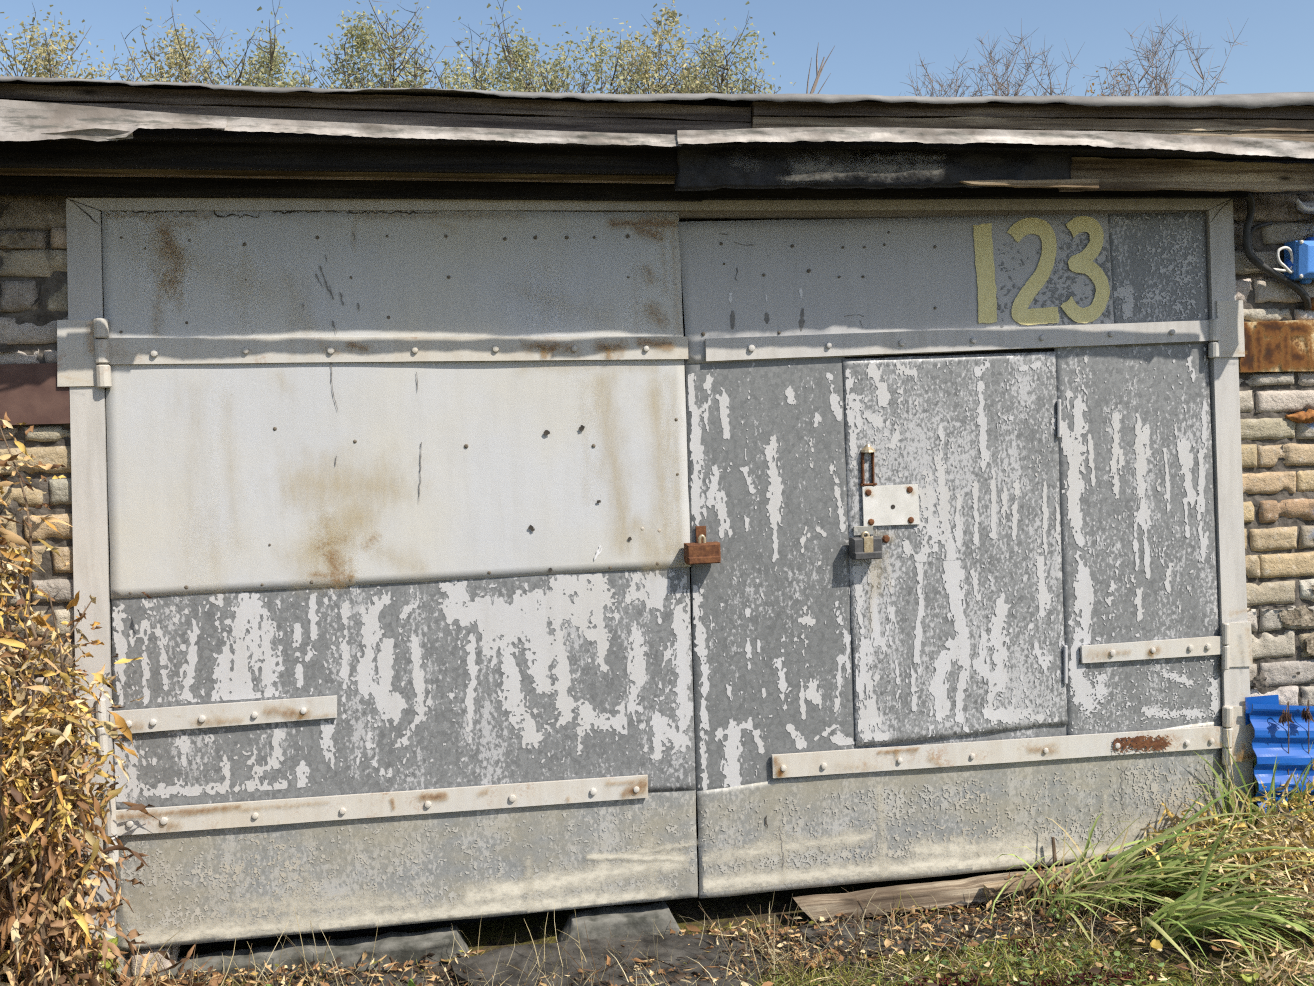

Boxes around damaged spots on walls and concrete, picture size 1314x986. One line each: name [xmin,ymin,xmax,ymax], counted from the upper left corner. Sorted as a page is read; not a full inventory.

peeling [112,344,1219,941]
rust [1240,321,1314,372]